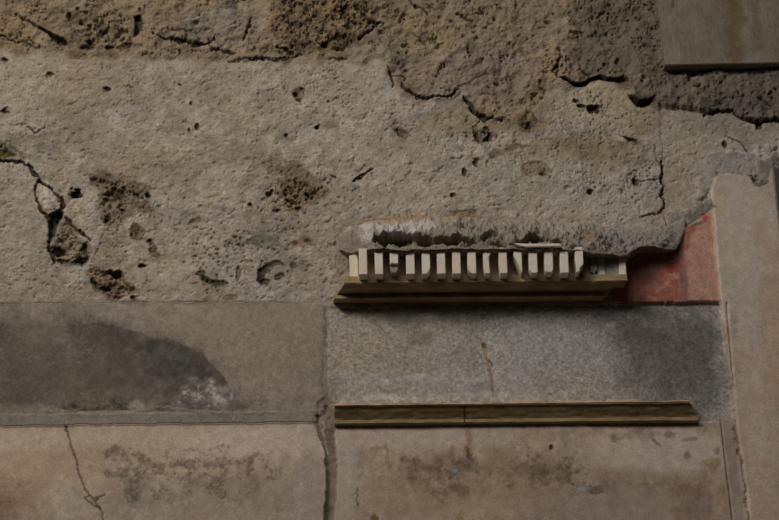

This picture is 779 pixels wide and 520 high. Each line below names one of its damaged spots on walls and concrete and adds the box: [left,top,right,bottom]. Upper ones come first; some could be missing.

crack [388,67,506,123]
crack [703,95,779,130]
crack [0,159,91,264]
spalling [49,221,136,301]
spalling [89,170,160,257]
spalling [256,158,329,213]
spalling [338,199,715,263]
crack [636,147,665,218]
damp [0,324,321,414]
crack [65,426,105,519]